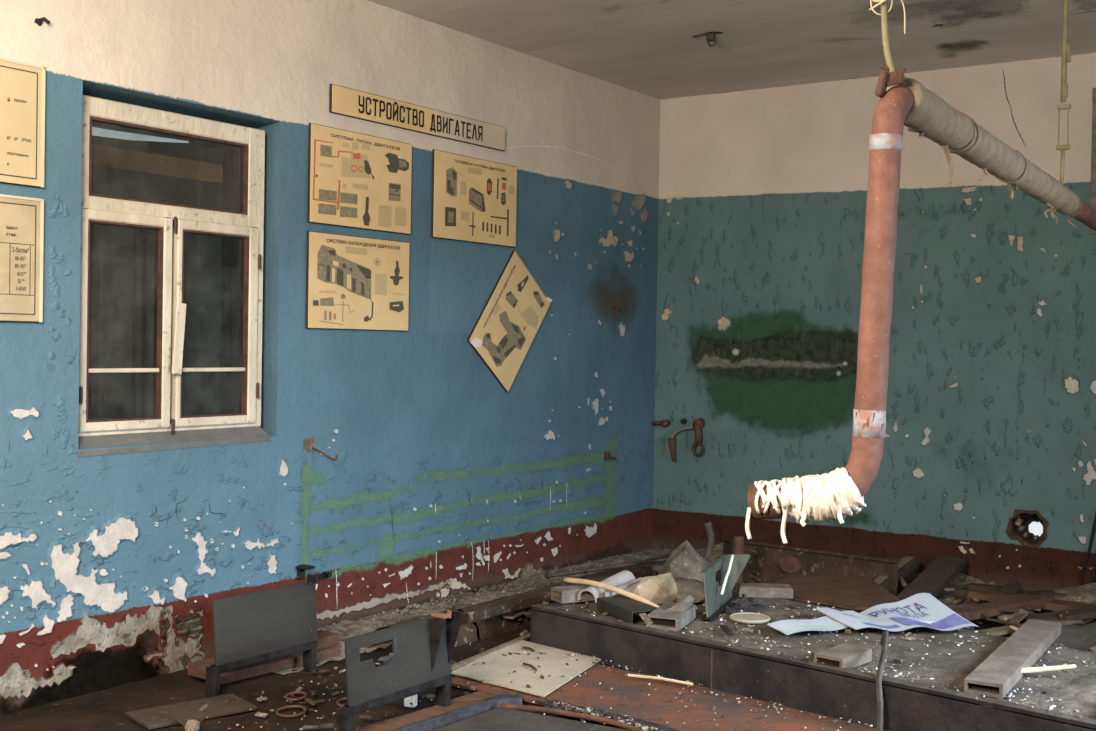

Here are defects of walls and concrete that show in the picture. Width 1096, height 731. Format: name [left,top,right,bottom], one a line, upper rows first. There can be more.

damp [942,41,983,49]
peeling [587,187,649,272]
peeling [716,314,732,332]
peeling [6,403,41,443]
peeling [1072,438,1096,487]
peeling [315,510,598,621]
peeling [956,540,977,556]
spalling [998,509,1049,570]
peeling [0,500,281,700]